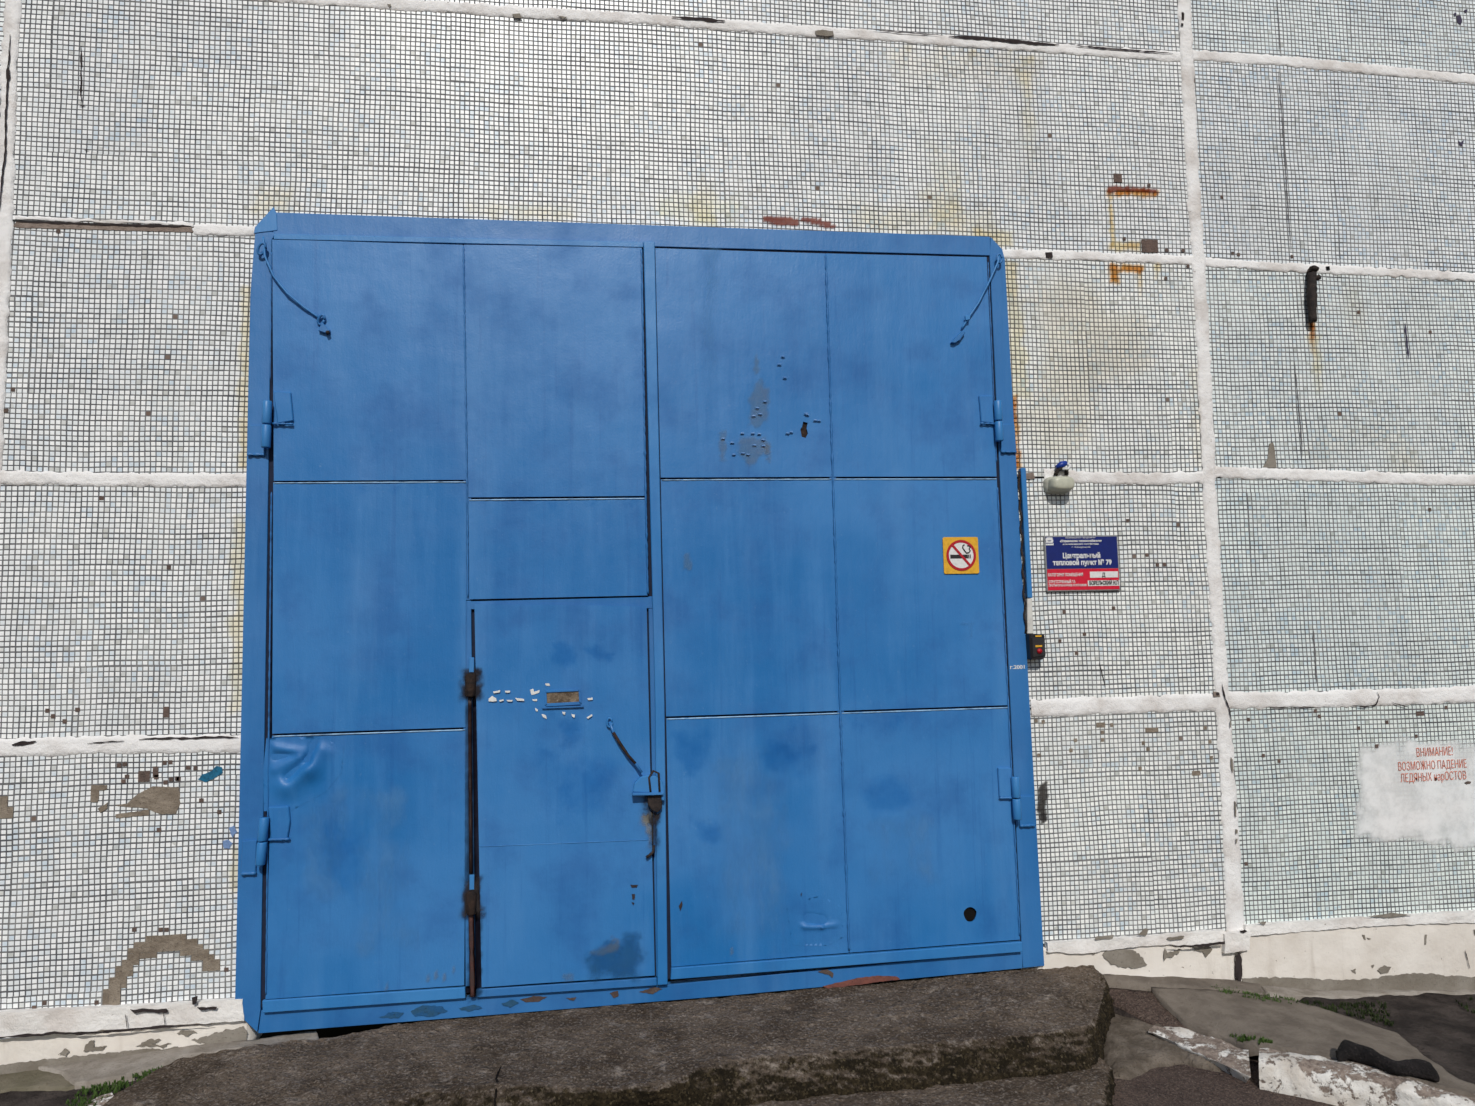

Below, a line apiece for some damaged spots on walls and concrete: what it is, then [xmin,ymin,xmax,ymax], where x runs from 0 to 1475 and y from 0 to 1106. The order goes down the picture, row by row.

corrosion [1108,186,1156,195]
spalling [94,927,229,1005]
corrosion [468,944,479,994]